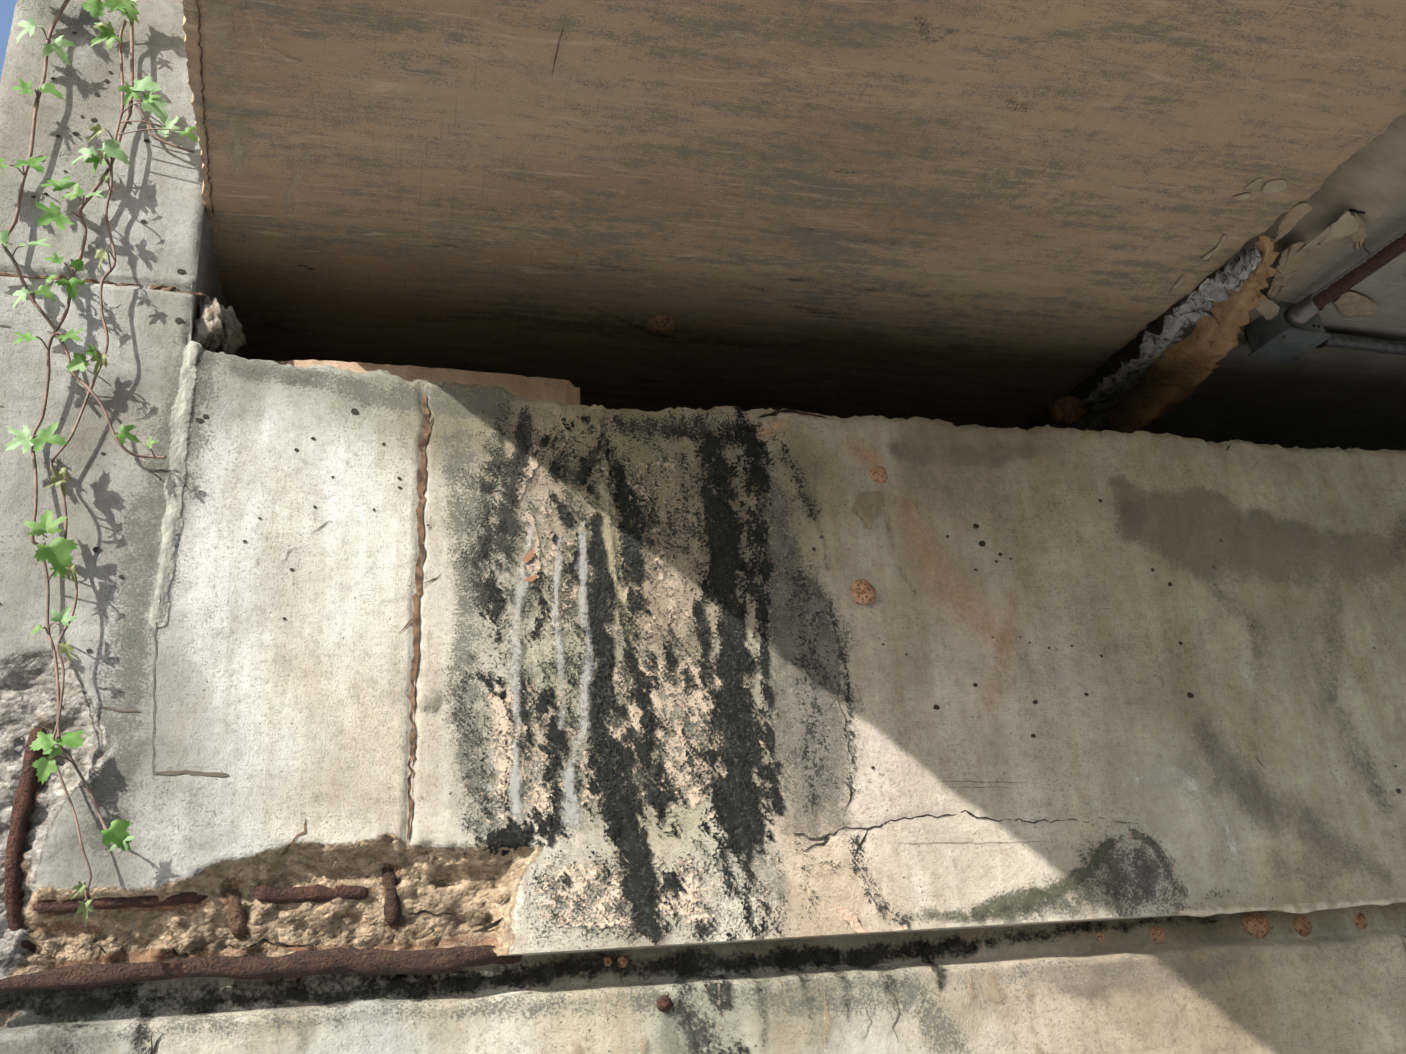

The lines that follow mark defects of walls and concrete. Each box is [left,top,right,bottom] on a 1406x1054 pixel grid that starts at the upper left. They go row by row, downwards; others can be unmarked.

peeling [1255,203,1368,320]
peeling [1333,291,1379,318]
peeling [586,450,691,634]
water stain [1113,479,1406,582]
spalling [0,650,770,979]
water stain [0,393,1239,1054]
crack [793,676,1133,858]
rust [35,878,237,934]
rust [53,935,267,969]
rust [287,924,502,951]